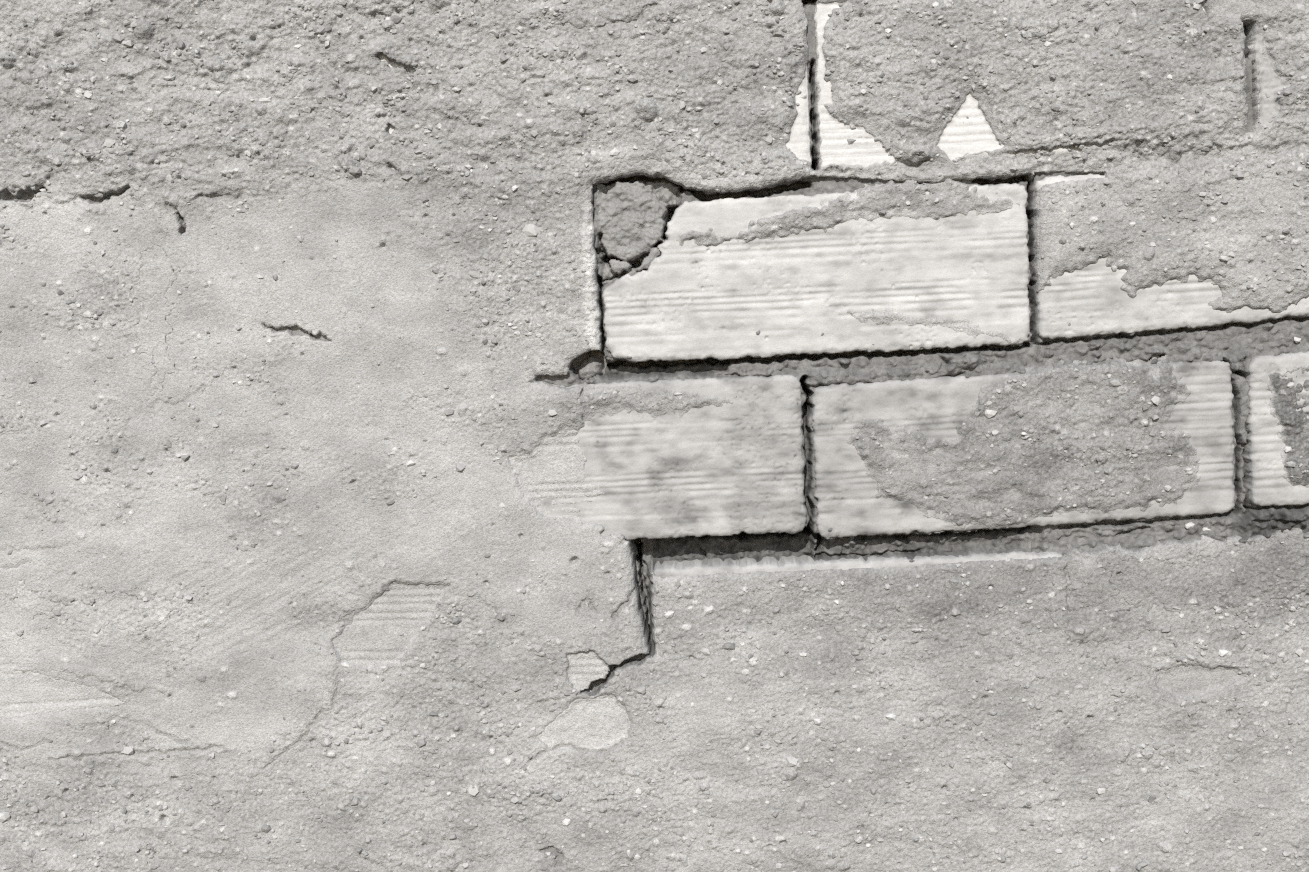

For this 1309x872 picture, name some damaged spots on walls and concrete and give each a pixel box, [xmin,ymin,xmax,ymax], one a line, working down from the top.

spalling [578,2,895,350]
spalling [937,93,1004,161]
spalling [1201,0,1306,131]
spalling [509,429,604,524]
crack [575,538,655,696]